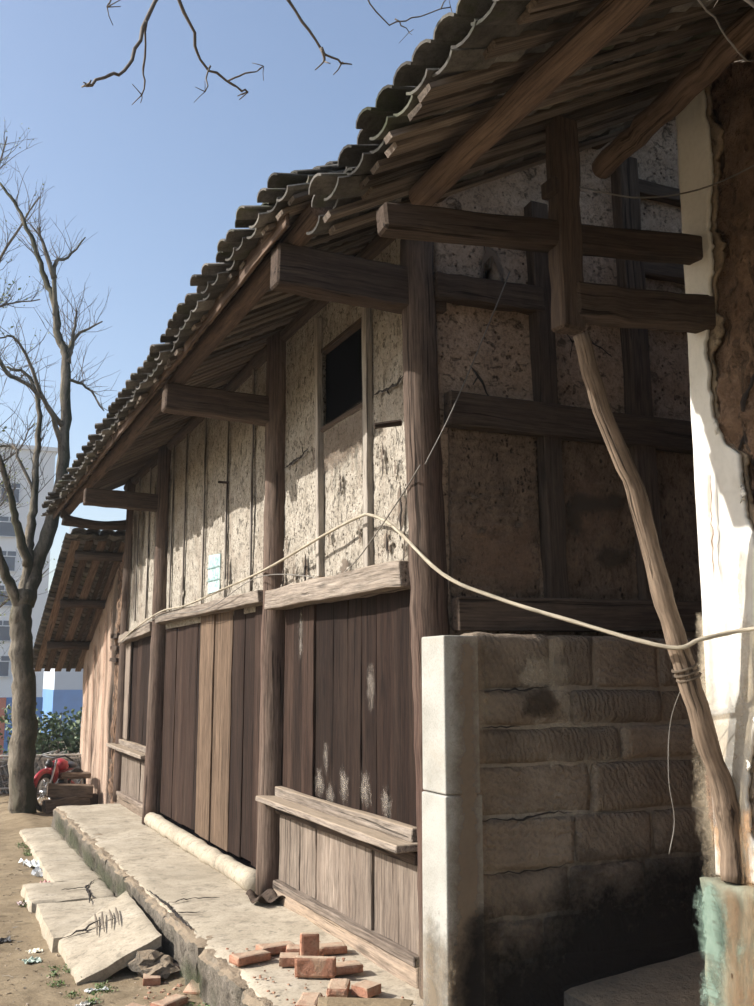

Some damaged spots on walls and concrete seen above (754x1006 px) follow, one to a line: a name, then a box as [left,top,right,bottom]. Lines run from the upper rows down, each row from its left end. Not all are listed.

crack [61,880,101,939]
crack [146,889,220,929]